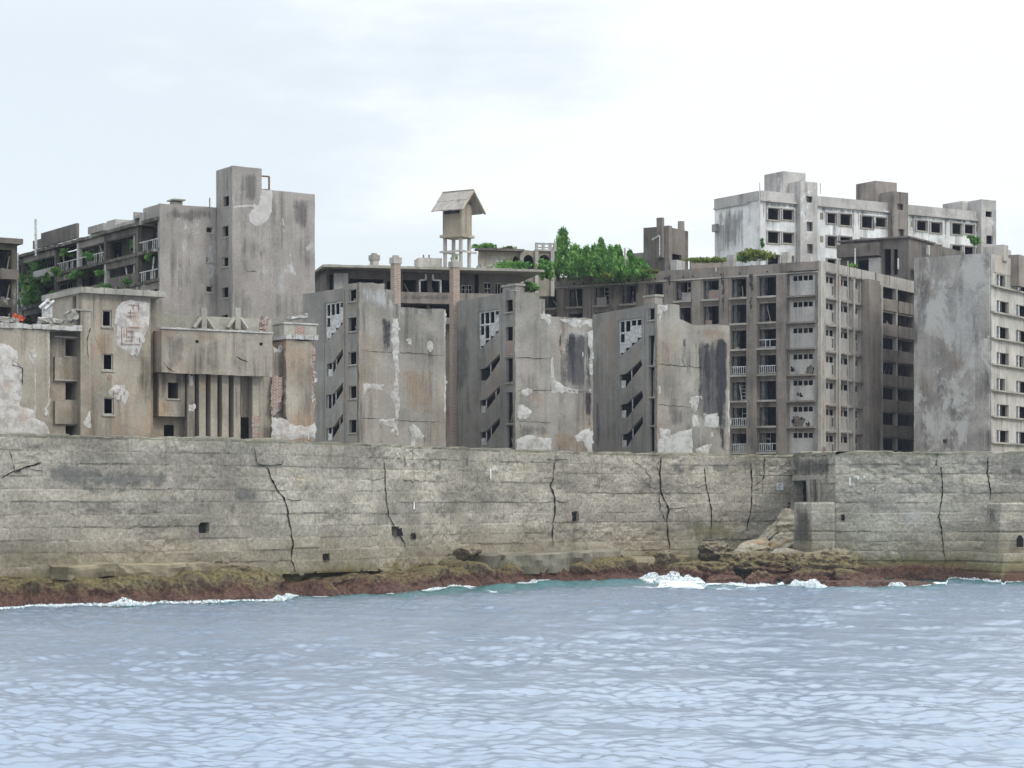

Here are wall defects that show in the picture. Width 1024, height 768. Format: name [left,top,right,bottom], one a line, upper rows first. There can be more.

peeling [233,189,284,226]
crack [3,453,42,478]
peeling [0,329,51,448]
peeling [114,300,150,356]
crack [254,448,301,569]
peeling [252,346,317,440]
crack [546,459,572,538]
water stain [560,334,591,415]
crack [635,456,712,550]
peeling [658,390,731,471]
water stain [699,339,727,448]
crack [935,453,946,564]